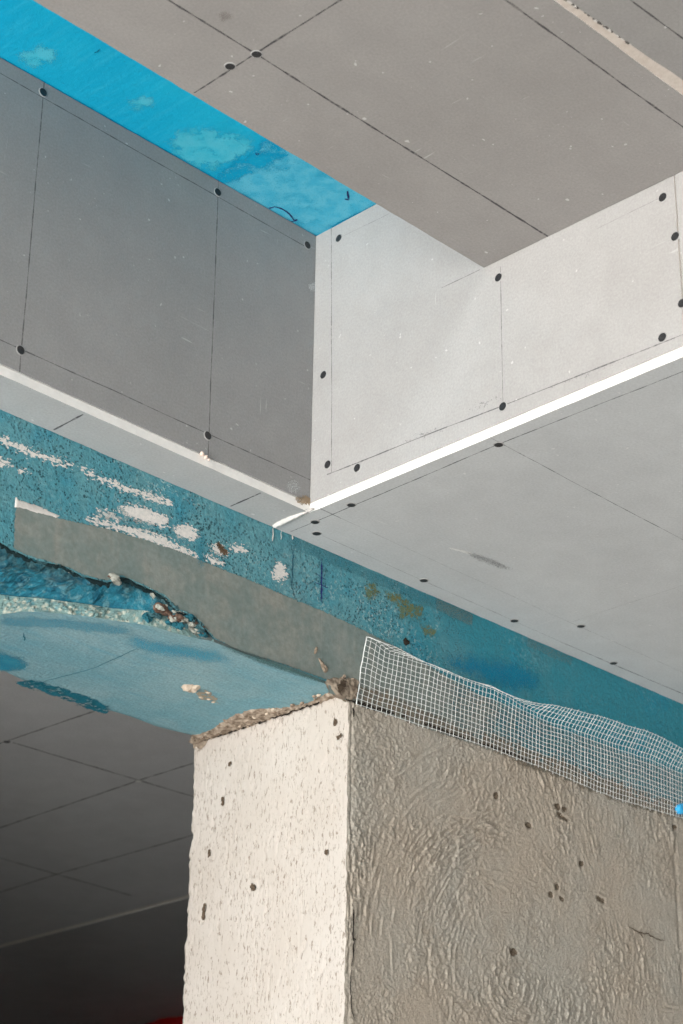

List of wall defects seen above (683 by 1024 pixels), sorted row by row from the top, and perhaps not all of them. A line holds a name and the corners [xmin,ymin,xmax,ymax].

spalling [0,543,214,642]
peeling [181,684,215,703]
spalling [188,647,359,750]